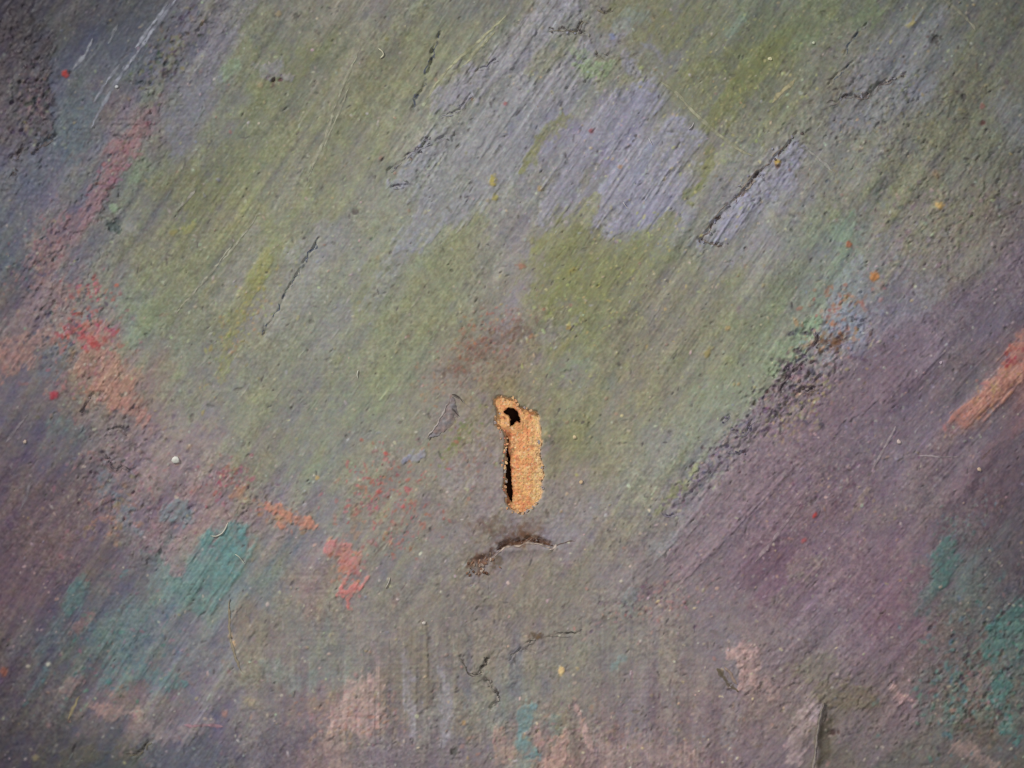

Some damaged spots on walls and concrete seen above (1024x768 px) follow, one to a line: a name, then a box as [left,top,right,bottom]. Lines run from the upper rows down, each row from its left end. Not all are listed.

crack [698,132,803,247]
crack [262,238,318,335]
peeling [493,395,544,515]